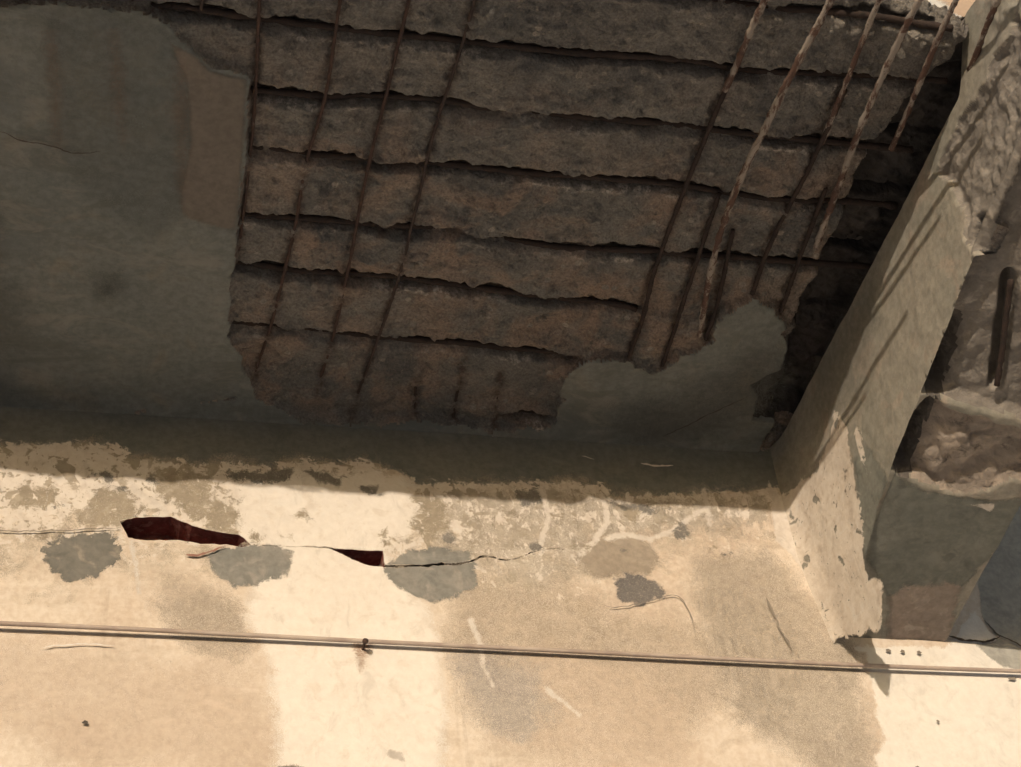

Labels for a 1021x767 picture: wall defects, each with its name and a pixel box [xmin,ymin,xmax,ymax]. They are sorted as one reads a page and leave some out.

spalling [0,0,1001,435]
spalling [910,9,1021,512]
crack [0,517,563,568]
peeling [0,410,964,654]